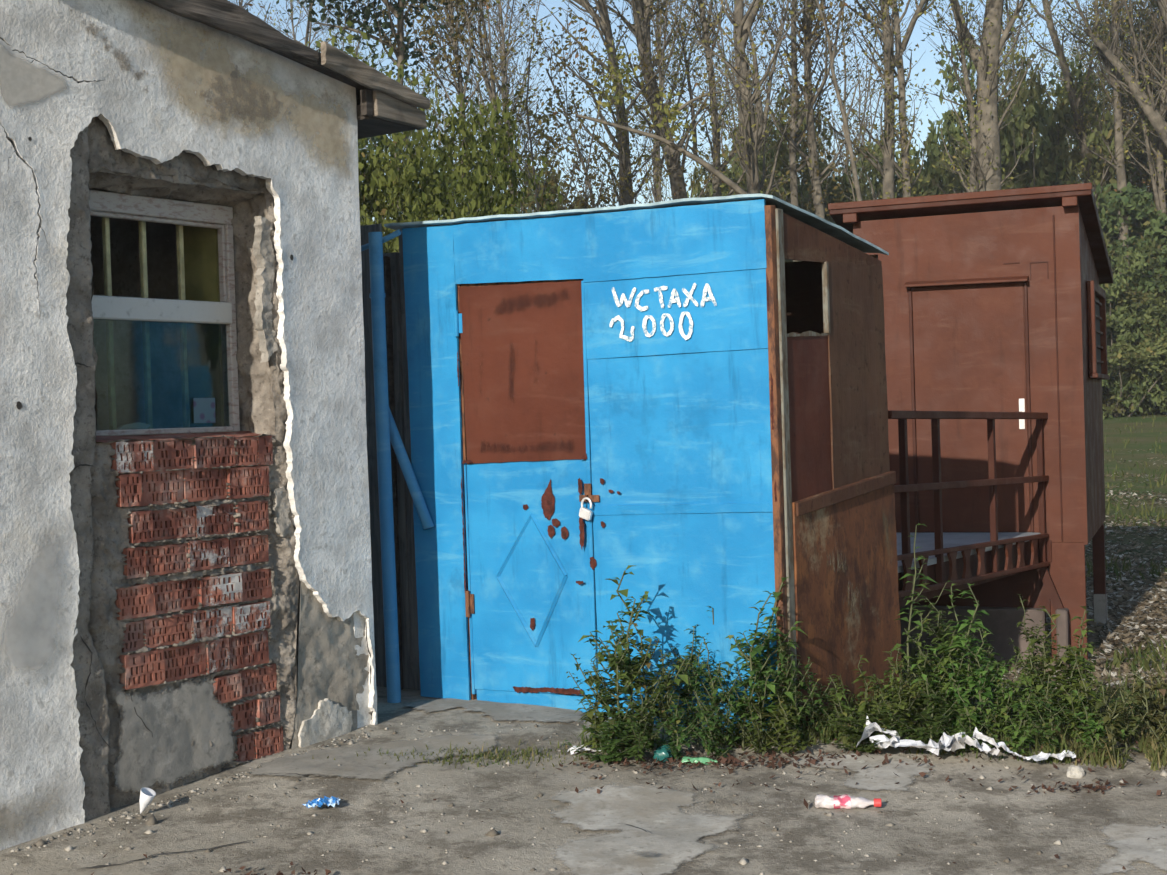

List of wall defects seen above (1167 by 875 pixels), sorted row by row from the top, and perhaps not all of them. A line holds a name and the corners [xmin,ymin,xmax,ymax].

leakage [142,13,346,166]
flaking render [65,116,372,821]
rust [523,479,597,569]
rust [578,478,620,495]